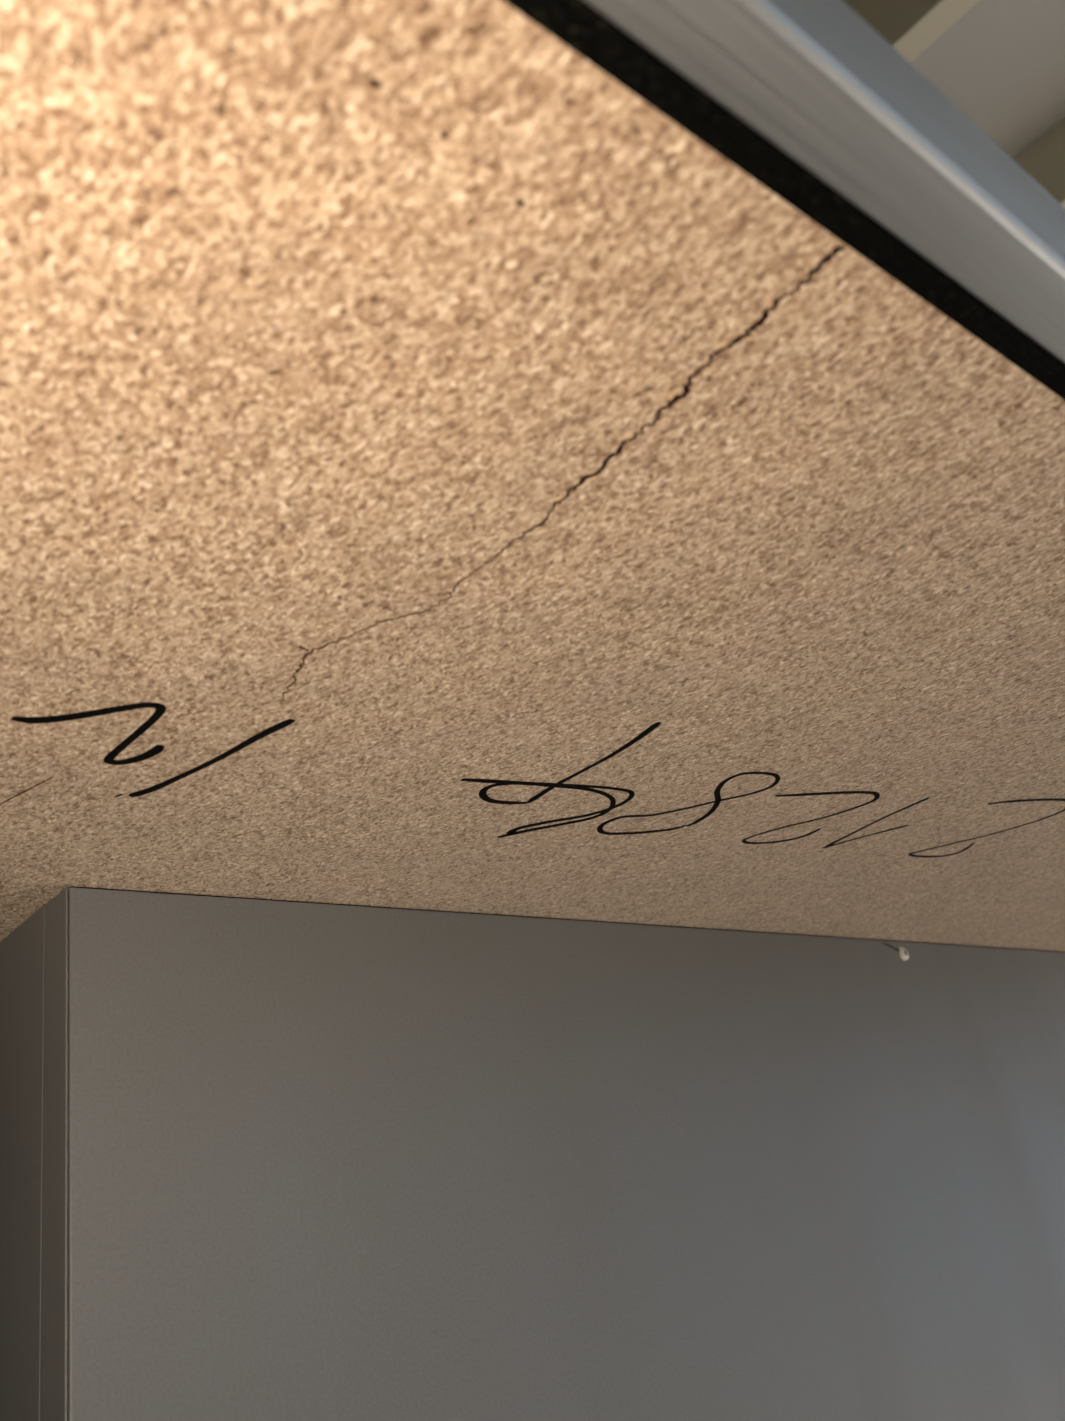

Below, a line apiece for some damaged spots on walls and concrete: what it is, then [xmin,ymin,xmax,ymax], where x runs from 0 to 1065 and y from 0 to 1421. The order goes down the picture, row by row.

crack [282,246,845,701]